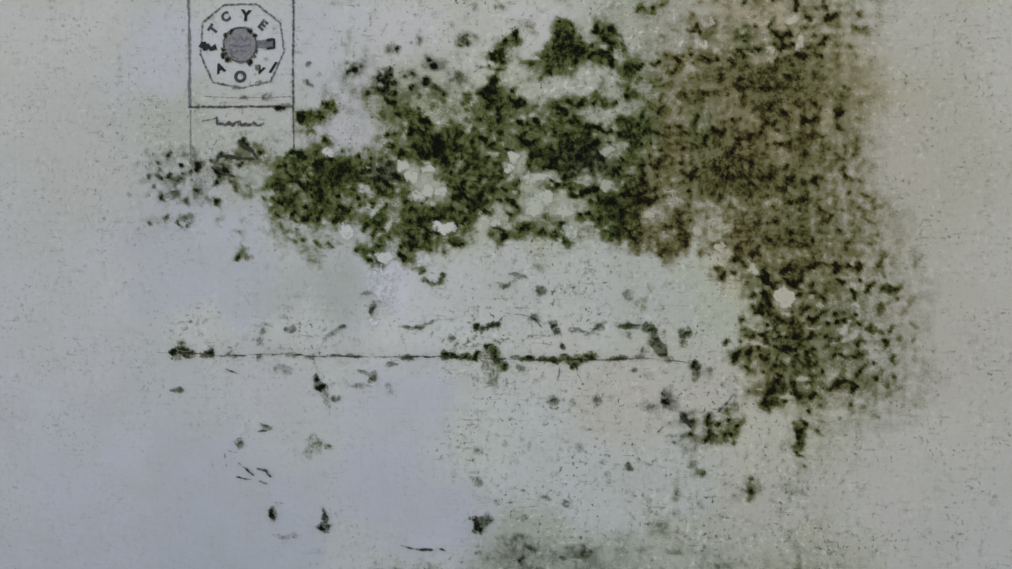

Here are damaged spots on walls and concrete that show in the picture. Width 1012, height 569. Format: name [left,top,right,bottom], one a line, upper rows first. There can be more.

water stain [146,16,629,286]
peeling [397,160,447,201]
peeling [504,151,579,241]
peeling [433,221,457,235]
peeling [773,286,796,309]
crack [473,313,541,329]
water stain [168,341,237,361]
crack [157,351,460,373]
water stain [440,313,674,386]
crack [484,358,690,377]
water stain [708,266,919,468]
water stain [646,388,746,477]